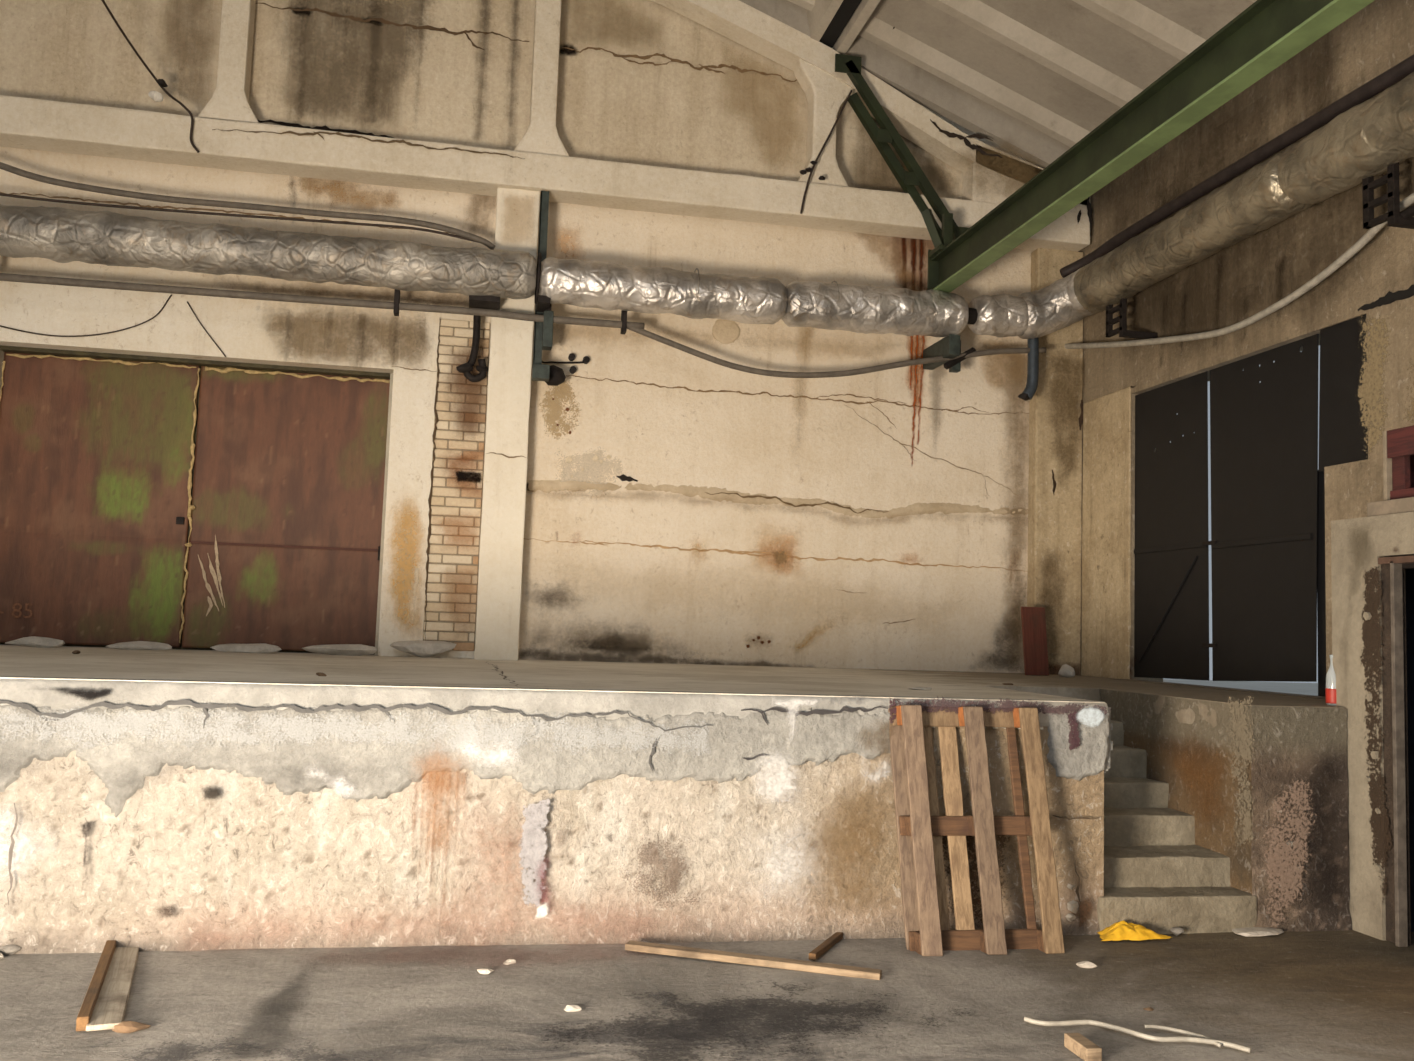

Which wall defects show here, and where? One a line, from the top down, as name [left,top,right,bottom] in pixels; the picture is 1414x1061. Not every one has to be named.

spalling [52,688,110,700]
spalling [203,788,220,799]